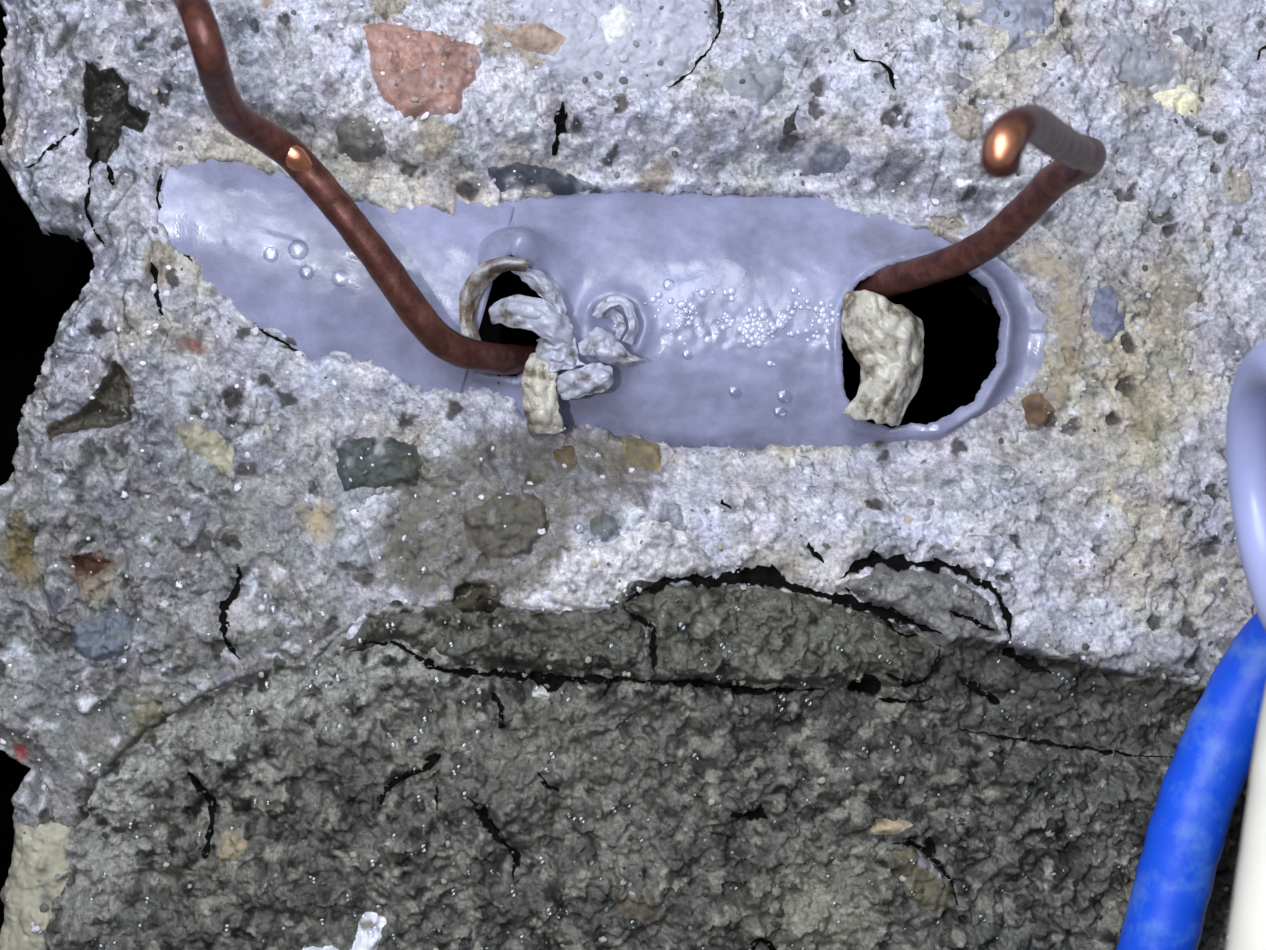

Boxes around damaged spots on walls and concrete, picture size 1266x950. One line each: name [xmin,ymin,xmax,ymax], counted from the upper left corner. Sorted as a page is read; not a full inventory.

crack [669,0,724,88]
crack [24,128,115,246]
spalling [0,161,95,486]
spalling [842,334,860,402]
spalling [865,282,1001,428]
crack [219,564,242,659]
leakage [363,434,651,623]
crack [359,542,1173,758]
spalling [847,563,1002,648]
spalling [0,750,31,932]
leakage [42,580,1206,950]
leakage [1197,773,1250,950]